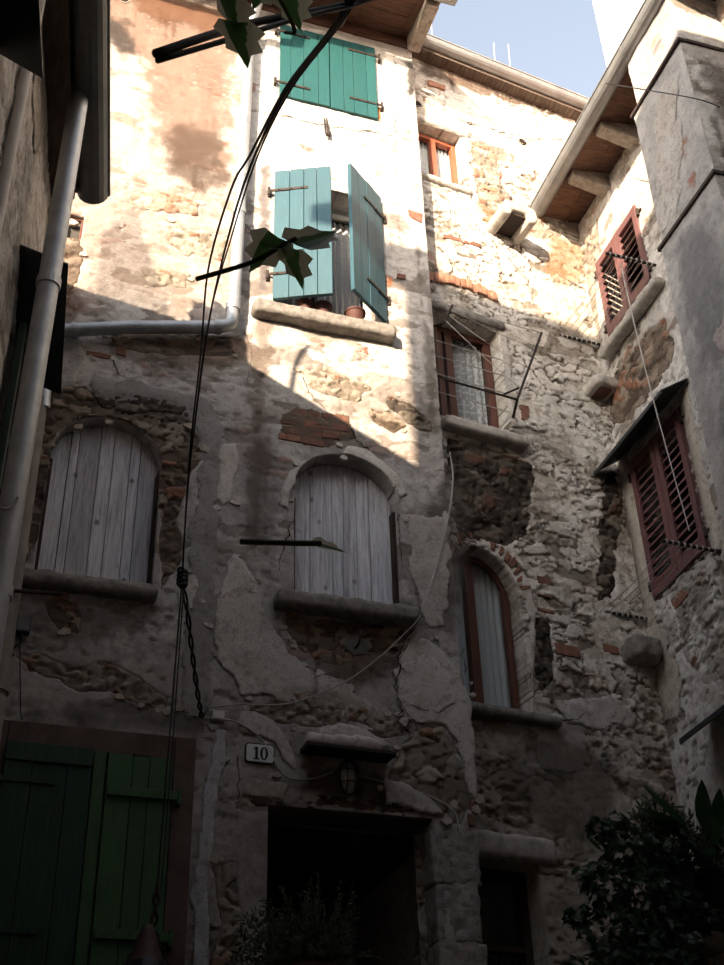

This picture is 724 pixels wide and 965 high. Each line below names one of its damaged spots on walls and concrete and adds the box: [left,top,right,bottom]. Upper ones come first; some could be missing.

damp [110,0,235,166]
flaking render [63,219,88,299]
flaking render [141,267,195,288]
flaking render [127,191,227,262]
flaking render [278,407,355,462]
flaking render [293,365,371,402]
flaking render [368,392,432,434]
flaking render [26,387,209,589]
flaking render [17,653,184,715]
crack [385,628,451,759]